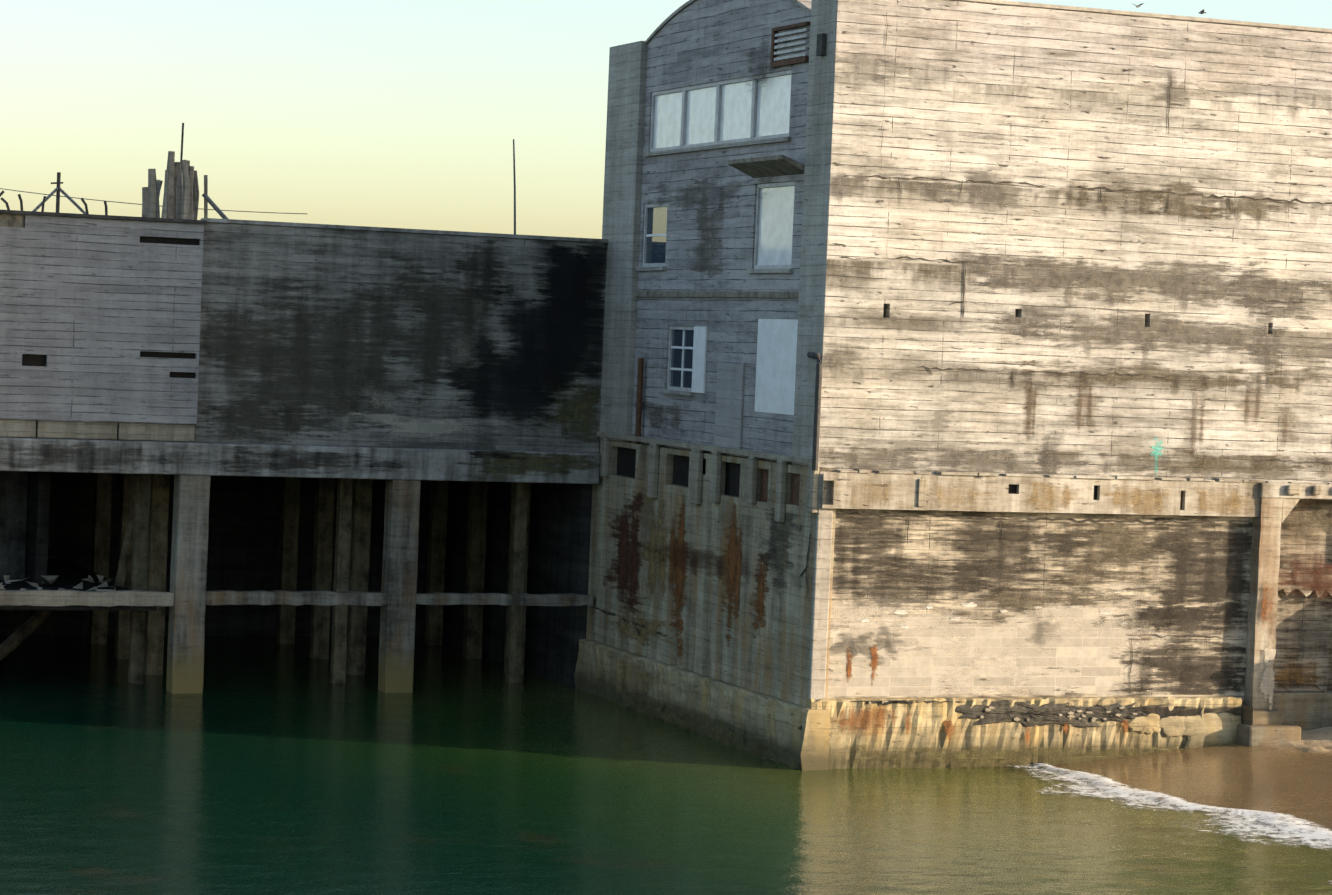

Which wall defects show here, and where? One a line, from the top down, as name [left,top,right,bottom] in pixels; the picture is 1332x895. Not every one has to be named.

leakage [1064,182,1295,219]
leakage [199,240,607,474]
corrosion [604,493,770,659]
corrosion [870,646,879,684]
leakage [833,509,1253,722]
corrosion [1279,555,1332,605]